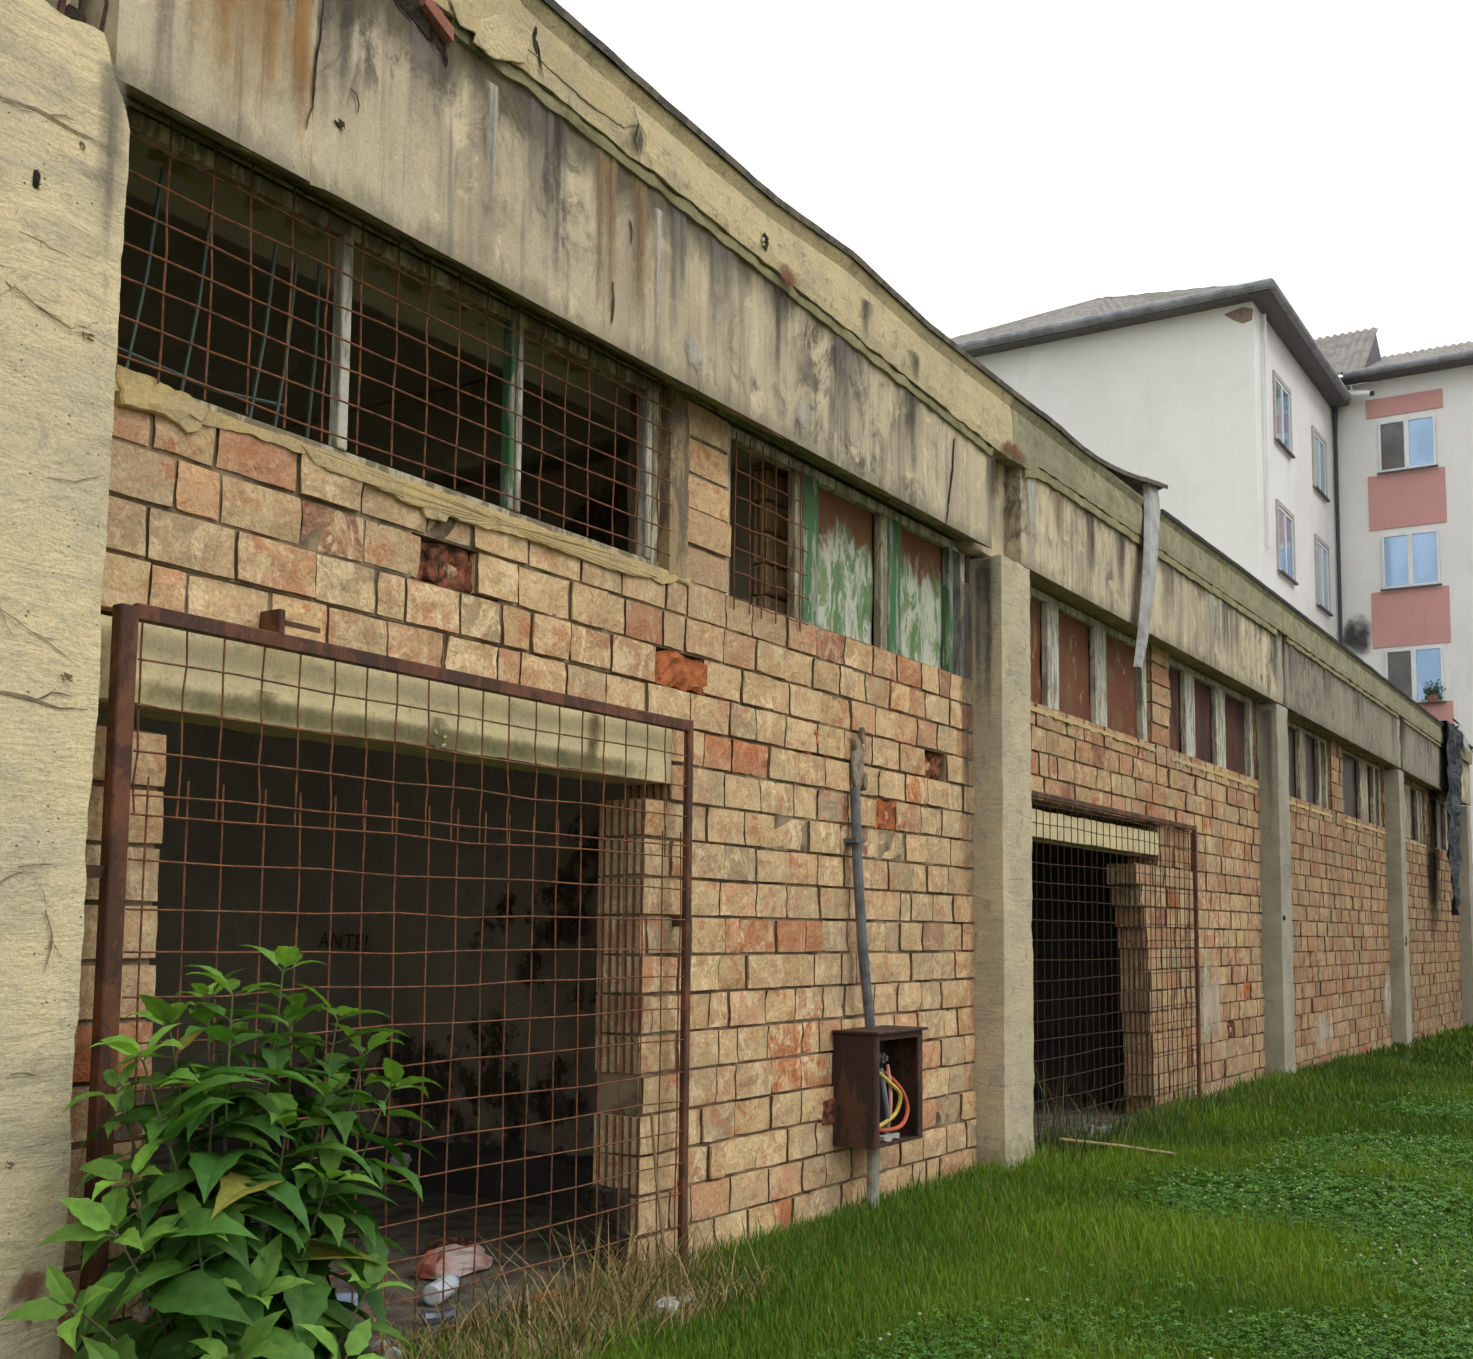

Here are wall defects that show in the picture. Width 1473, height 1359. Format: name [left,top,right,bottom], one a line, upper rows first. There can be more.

rust [223,0,312,89]
crack [306,0,324,130]
peeling [393,0,638,128]
crack [0,96,122,153]
water stain [488,82,498,166]
peeling [301,445,658,578]
water stain [564,480,629,552]
spalling [412,541,486,599]
crack [0,607,88,710]
spalling [642,650,708,696]
mould [469,815,601,1012]
mould [272,1009,594,1155]